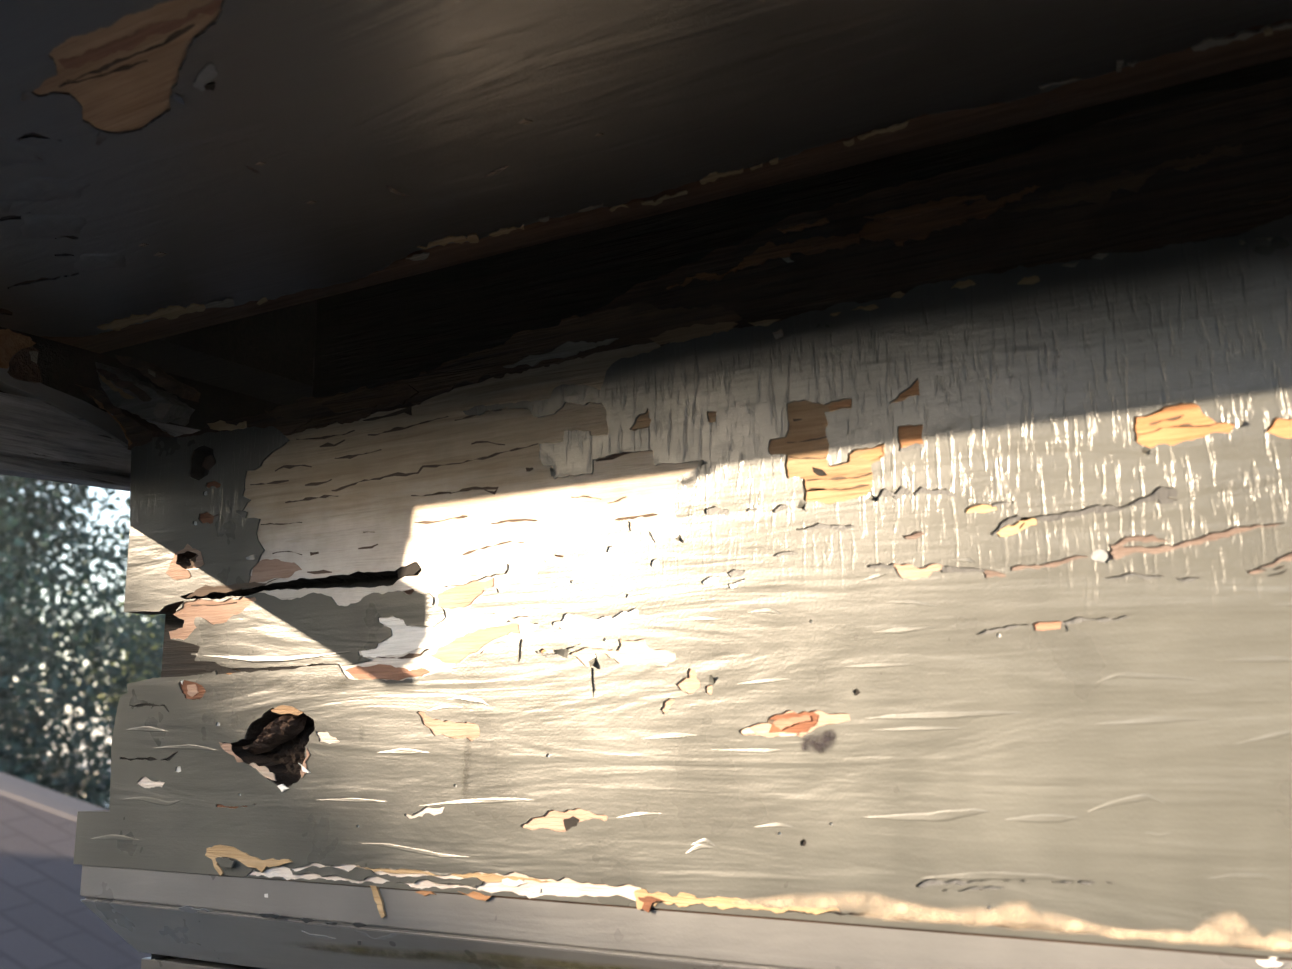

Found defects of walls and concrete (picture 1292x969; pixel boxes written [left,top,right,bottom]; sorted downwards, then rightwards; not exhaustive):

peeling [1133,403,1243,453]
peeling [769,399,925,509]
peeling [169,342,703,681]
crack [705,504,855,557]
crack [874,486,957,502]
crack [941,487,1292,582]
crack [184,562,422,599]
crack [867,562,895,570]
crack [977,624,1030,635]
peeling [250,763,290,792]
peeling [522,808,607,832]
peeling [205,845,841,915]